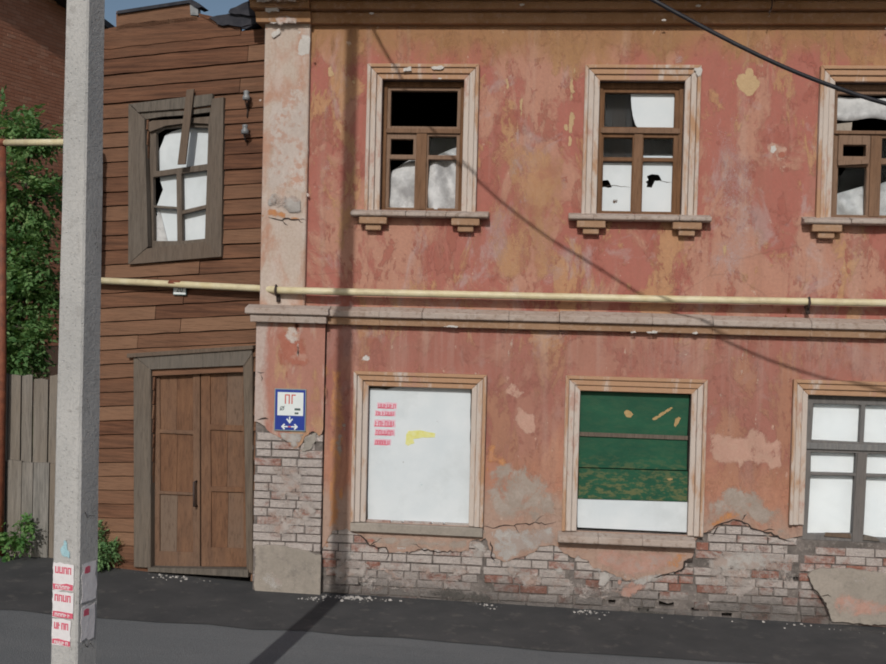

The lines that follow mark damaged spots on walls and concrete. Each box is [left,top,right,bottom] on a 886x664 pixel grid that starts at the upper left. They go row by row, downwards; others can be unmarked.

peeling [736,68,761,96]
flaking render [252,366,886,627]
crack [487,516,551,561]